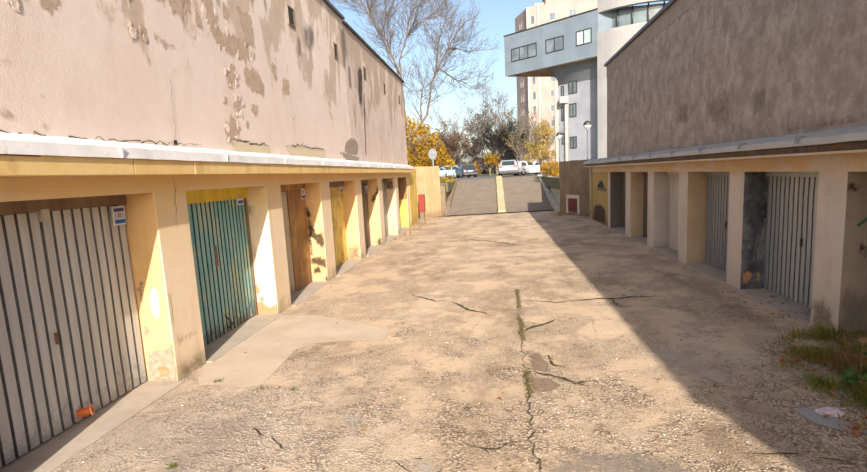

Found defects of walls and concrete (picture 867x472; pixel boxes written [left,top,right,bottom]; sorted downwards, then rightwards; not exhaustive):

peeling [40,0,60,15]
peeling [128,19,174,48]
peeling [162,0,269,154]
peeling [271,63,289,95]
crack [68,86,201,146]
flaking render [286,143,325,158]
peeling [137,282,172,324]
flaking render [147,343,177,381]
crack [465,287,650,472]